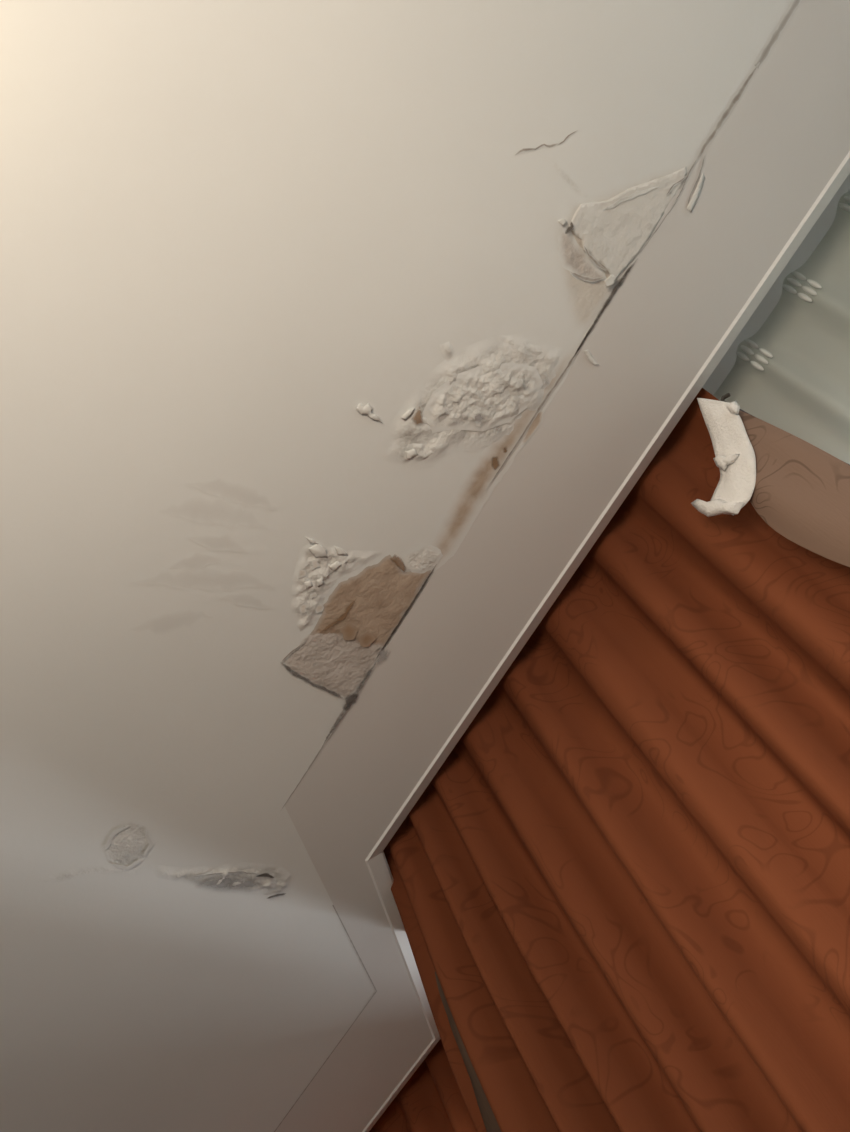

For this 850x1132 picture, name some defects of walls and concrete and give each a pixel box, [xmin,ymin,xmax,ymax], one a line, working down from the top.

peeling [553,160,705,332]
crack [487,0,801,488]
water stain [431,337,584,572]
peeling [281,536,443,700]
crack [377,569,434,657]
crack [281,743,325,810]